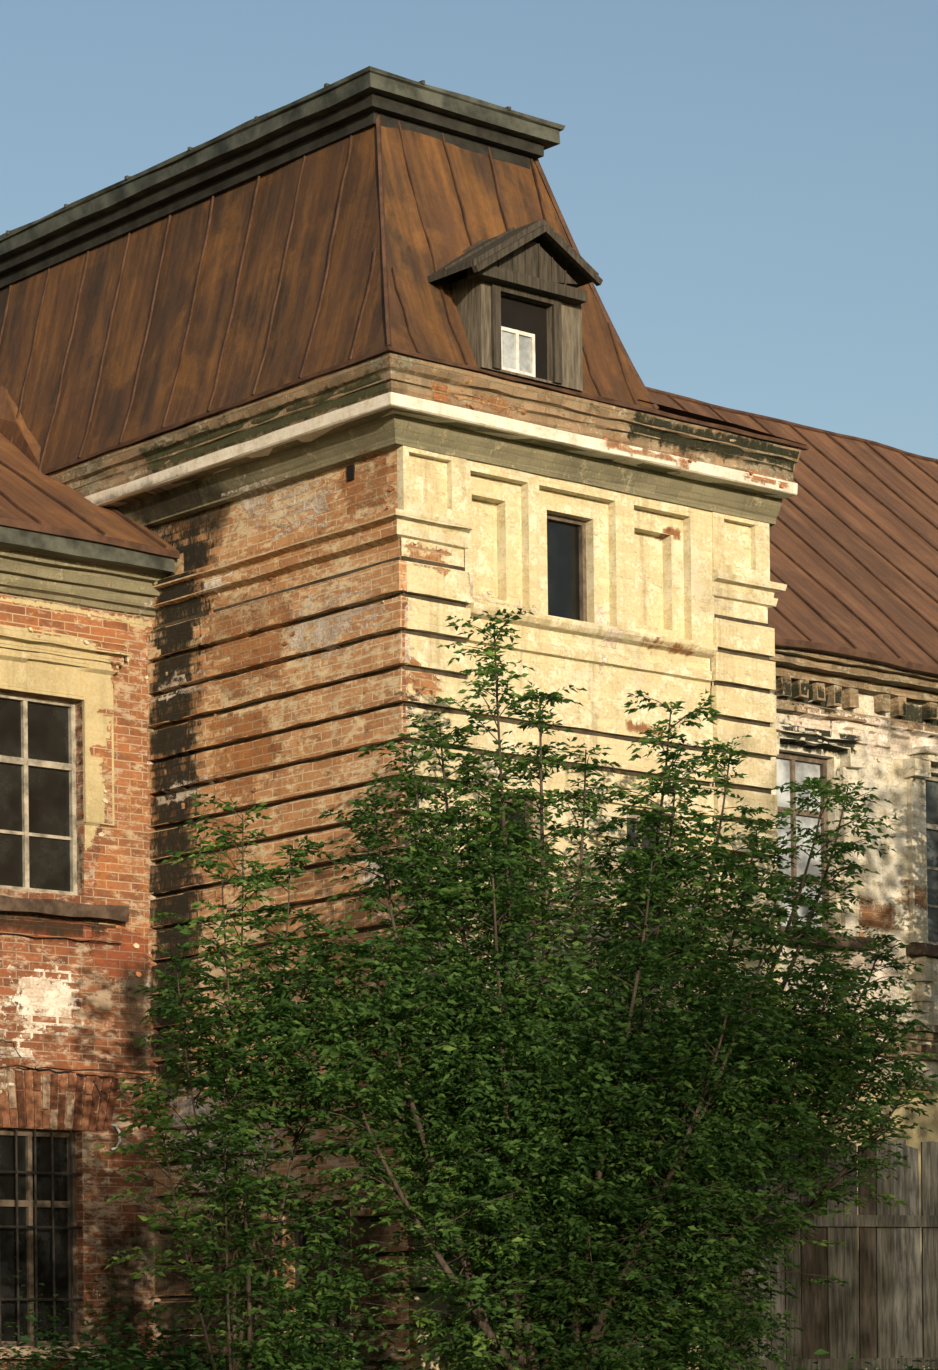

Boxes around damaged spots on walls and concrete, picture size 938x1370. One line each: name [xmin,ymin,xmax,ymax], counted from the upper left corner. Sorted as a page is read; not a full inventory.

spalling [339,450,395,515]
spalling [603,438,695,474]
spalling [744,469,788,495]
spalling [197,576,310,900]
water stain [280,580,419,801]
spalling [401,540,452,854]
peeling [789,700,938,769]
spalling [0,601,155,1093]
water stain [105,470,334,1143]
peeling [830,879,928,1006]
crack [2,1039,148,1098]